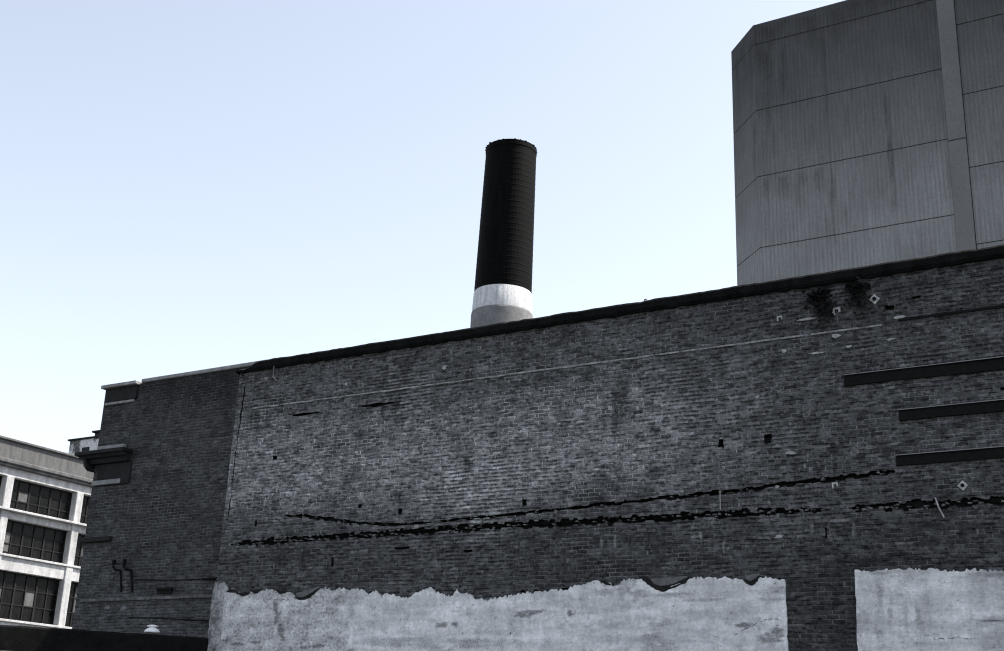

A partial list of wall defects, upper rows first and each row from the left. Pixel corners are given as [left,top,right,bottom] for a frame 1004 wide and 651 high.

crack [227,382,1004,547]
peeling [641,576,690,592]